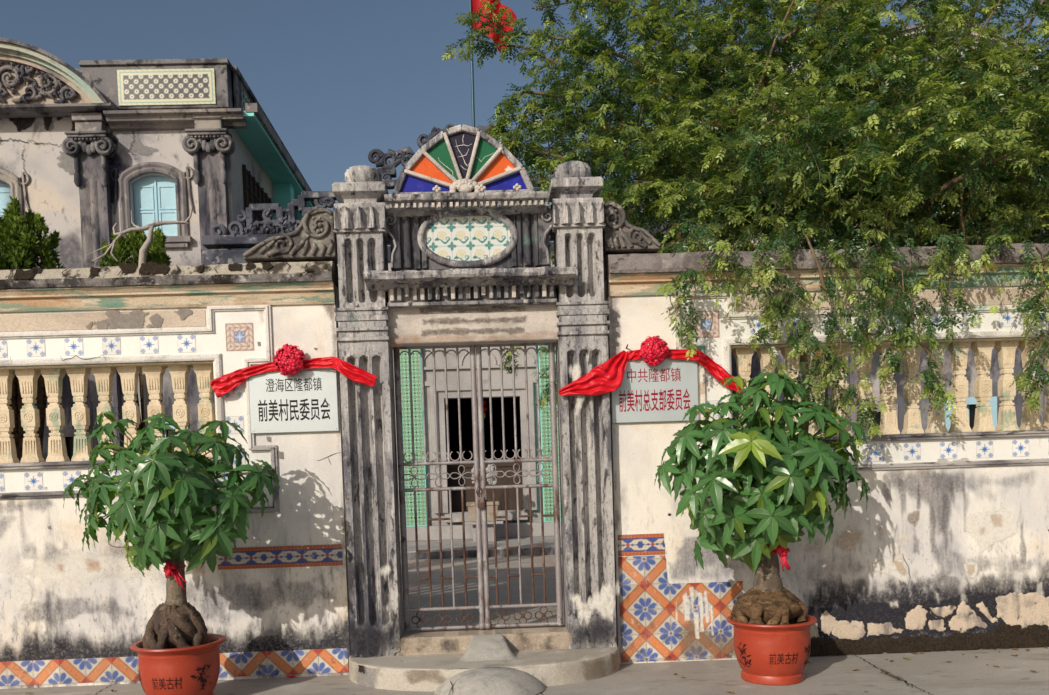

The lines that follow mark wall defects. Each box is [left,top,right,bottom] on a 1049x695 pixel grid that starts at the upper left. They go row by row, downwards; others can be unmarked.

crack [0,138,61,187]
damp [54,237,81,269]
spalling [86,309,163,330]
spalling [175,308,193,320]
damp [808,559,1049,611]
damp [0,634,141,662]
damp [219,617,401,674]
damp [573,616,617,680]
spalling [808,590,1049,641]
damp [863,617,998,640]